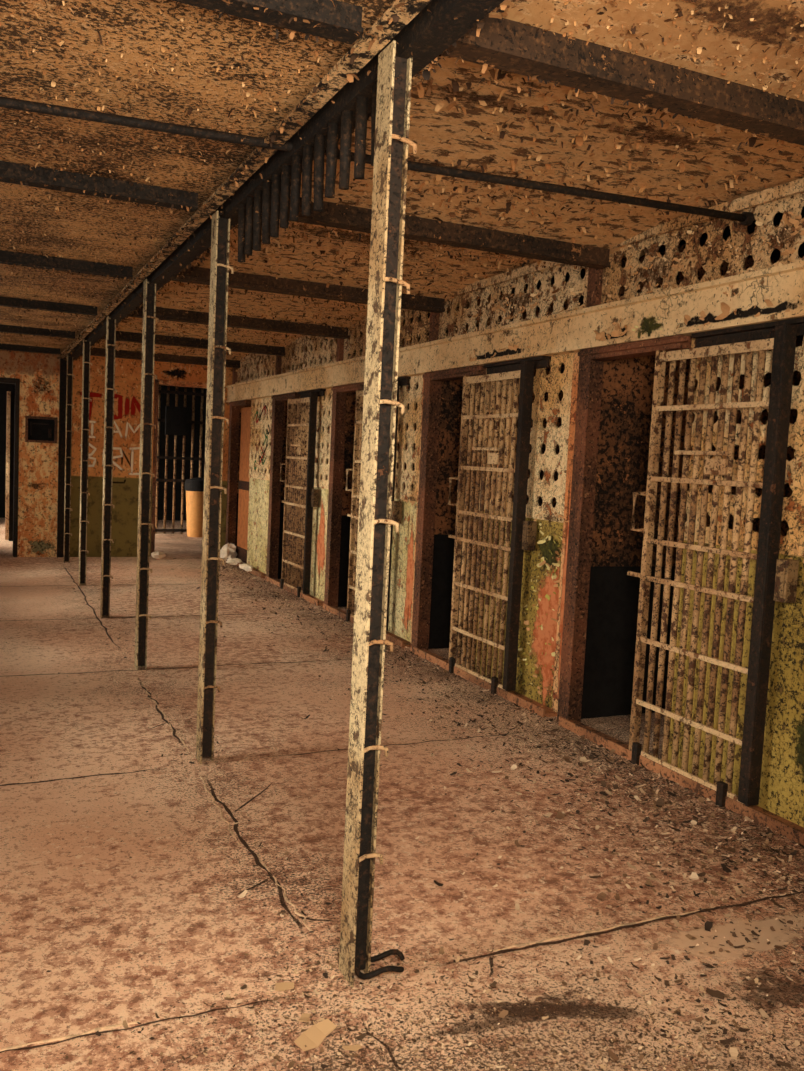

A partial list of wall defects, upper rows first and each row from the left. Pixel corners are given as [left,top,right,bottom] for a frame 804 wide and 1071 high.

peeling [26,536,56,557]
peeling [518,509,569,689]
crack [13,566,191,751]
crack [0,768,167,786]
crack [260,749,348,758]
crack [384,731,533,746]
crack [200,776,333,933]
crack [425,891,804,976]
crack [0,995,294,1053]
crack [361,1019,403,1071]